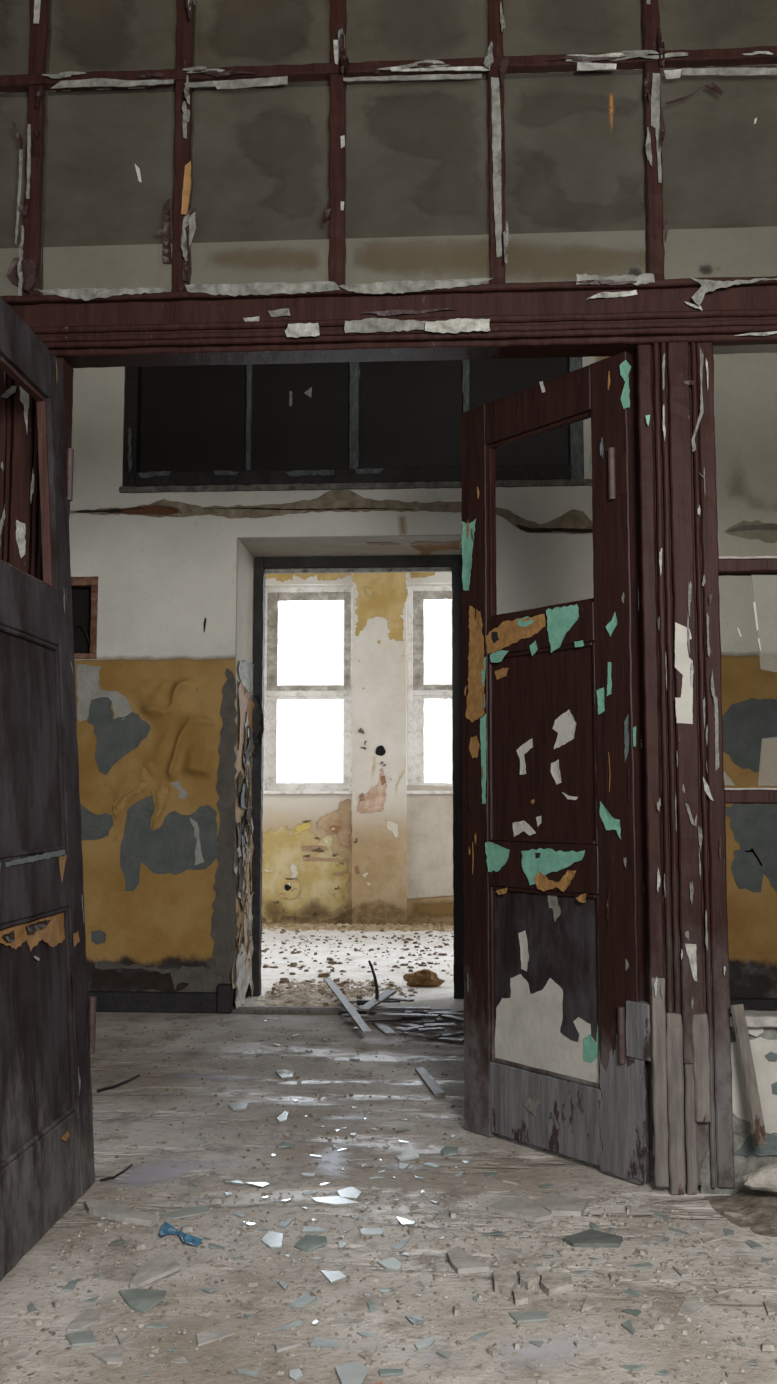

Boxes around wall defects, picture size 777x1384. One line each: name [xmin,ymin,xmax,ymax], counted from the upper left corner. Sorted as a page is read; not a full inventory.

peeling [0,660,399,1009]
peeling [266,519,584,804]
peeling [657,784,708,1010]
peeling [658,575,777,893]